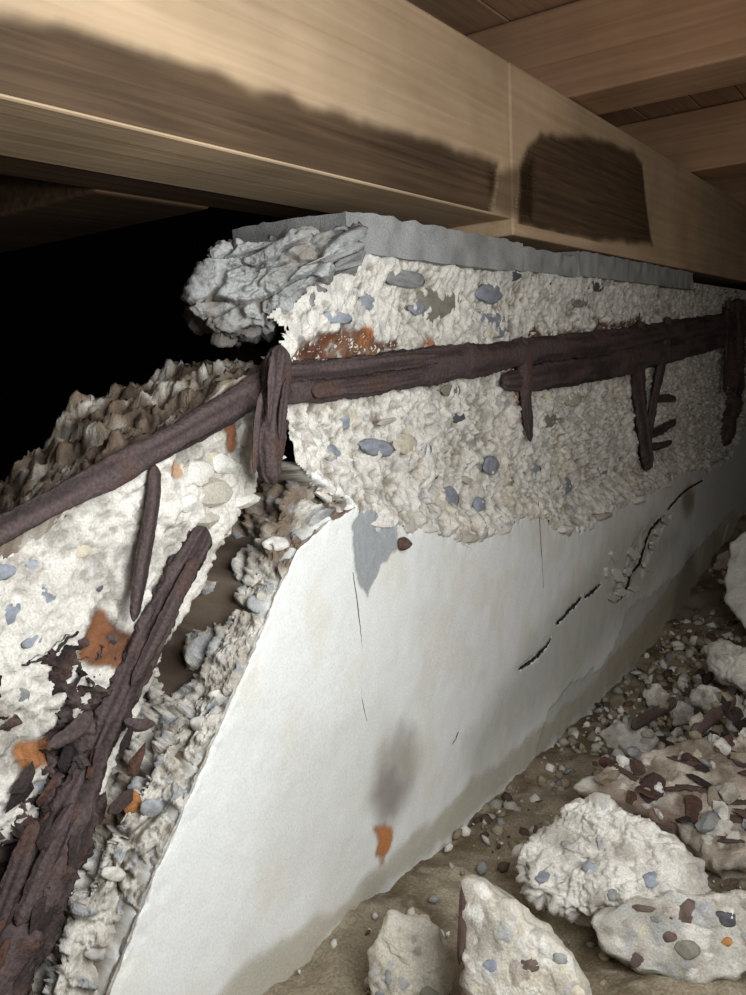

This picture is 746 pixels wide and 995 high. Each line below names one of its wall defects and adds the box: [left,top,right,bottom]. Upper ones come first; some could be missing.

water stain [0,18,497,212]
water stain [519,135,652,243]
rust [291,324,398,361]
crack [0,631,79,698]
rust [79,610,132,667]
spalling [0,221,746,995]
crack [519,480,703,670]
rust [5,739,58,852]
rust [96,789,142,825]
rust [119,726,146,776]
rust [375,825,393,856]
water stain [224,512,739,995]